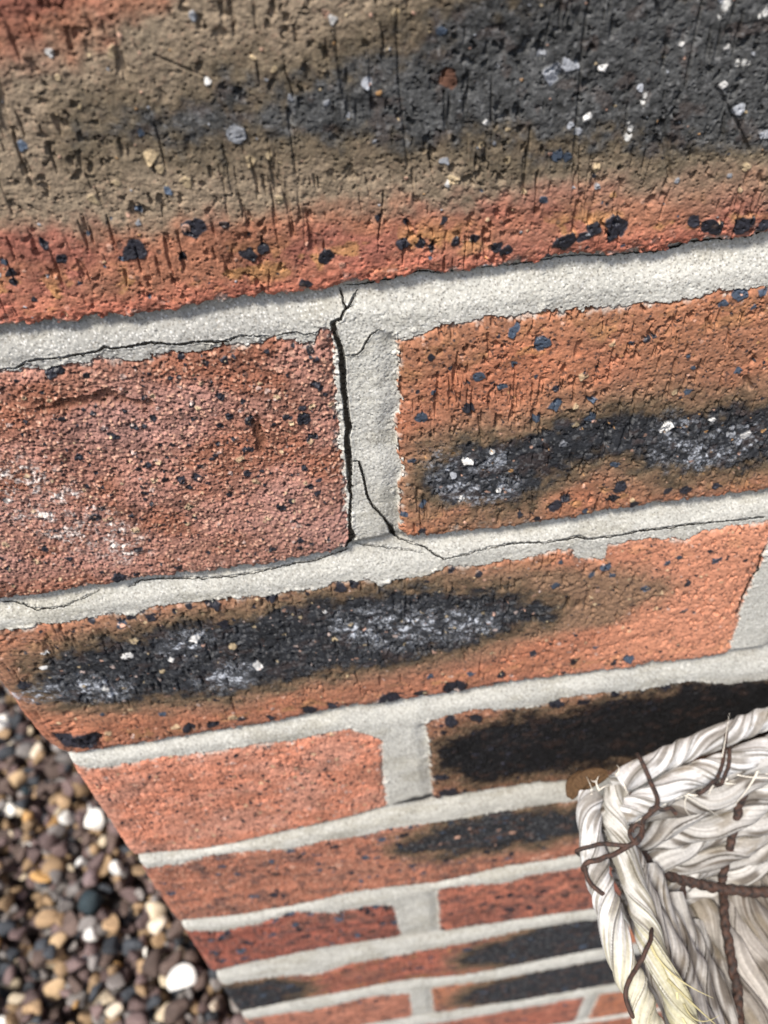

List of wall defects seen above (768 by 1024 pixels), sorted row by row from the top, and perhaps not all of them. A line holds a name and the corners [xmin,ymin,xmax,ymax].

water stain [63,0,768,171]
crack [5,232,764,587]
water stain [418,399,768,510]
crack [2,590,99,611]
water stain [20,580,566,709]
crack [736,548,765,613]
water stain [430,679,768,788]